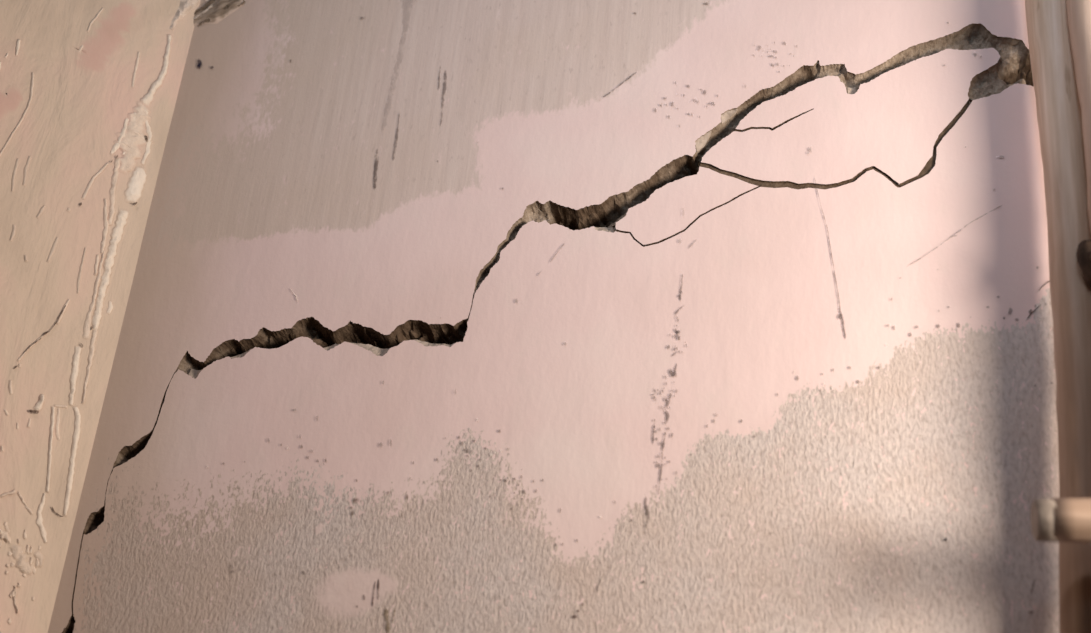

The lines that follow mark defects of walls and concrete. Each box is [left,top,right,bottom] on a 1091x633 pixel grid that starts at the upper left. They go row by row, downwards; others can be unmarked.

crack [66,162,109,213]
peeling [109,0,743,270]
crack [474,23,1034,295]
crack [62,293,474,633]
peeling [64,286,1060,633]